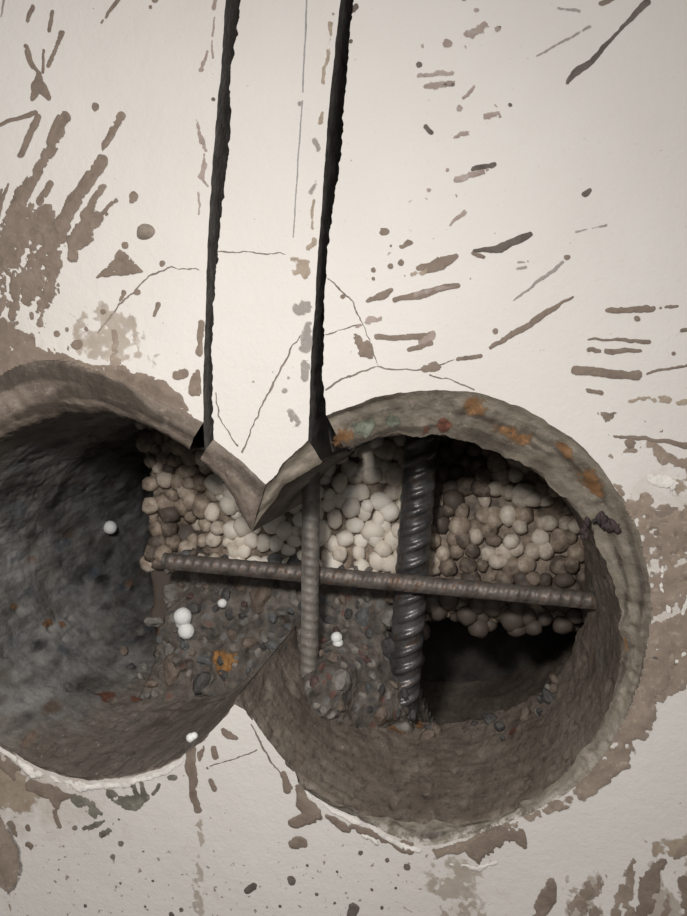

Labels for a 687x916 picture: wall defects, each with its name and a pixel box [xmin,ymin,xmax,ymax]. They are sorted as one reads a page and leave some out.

damp [0,110,41,158]
damp [18,111,71,206]
damp [53,111,126,234]
crack [217,249,283,257]
crack [215,335,301,453]
corrosion [576,469,603,498]
damp [613,435,687,494]
spalling [138,434,596,734]
damp [428,483,687,916]
spalling [0,747,183,793]
peeling [206,746,219,792]
spalling [306,791,422,853]